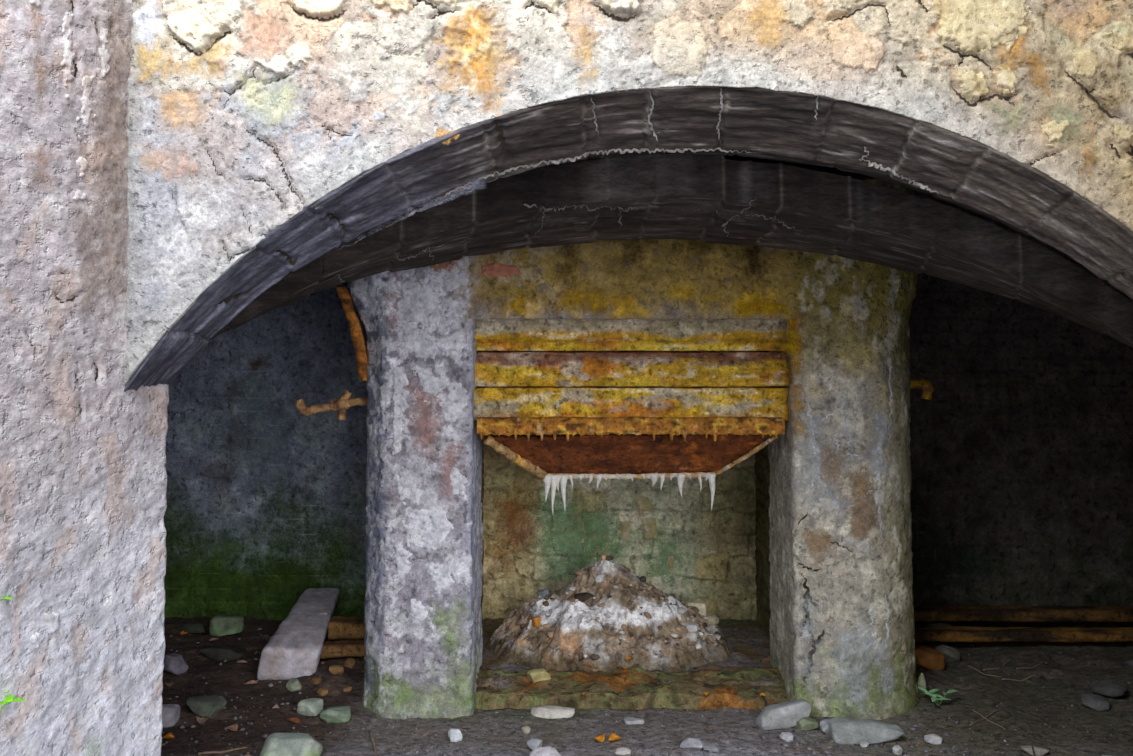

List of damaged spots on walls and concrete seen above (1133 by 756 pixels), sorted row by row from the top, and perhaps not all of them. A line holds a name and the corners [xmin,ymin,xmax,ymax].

crack [220,68,293,109]
crack [647,89,660,142]
crack [716,88,727,156]
crack [1065,71,1133,158]
crack [205,130,347,266]
crack [523,204,654,234]
crack [722,197,799,237]
crack [218,293,241,304]
corrosion [477,300,804,442]
crack [798,563,824,687]